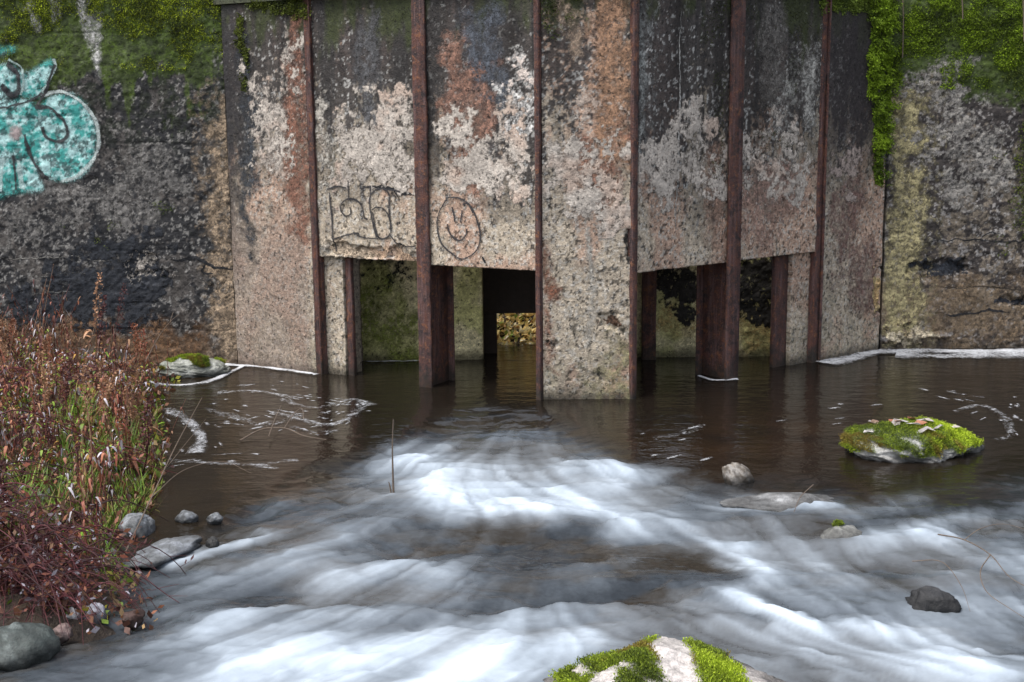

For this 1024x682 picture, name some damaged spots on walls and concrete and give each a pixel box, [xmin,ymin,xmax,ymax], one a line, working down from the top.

water stain [198,35,261,356]
rust [284,13,310,242]
rust [436,33,495,175]
rust [580,0,632,199]
water stain [757,3,820,130]